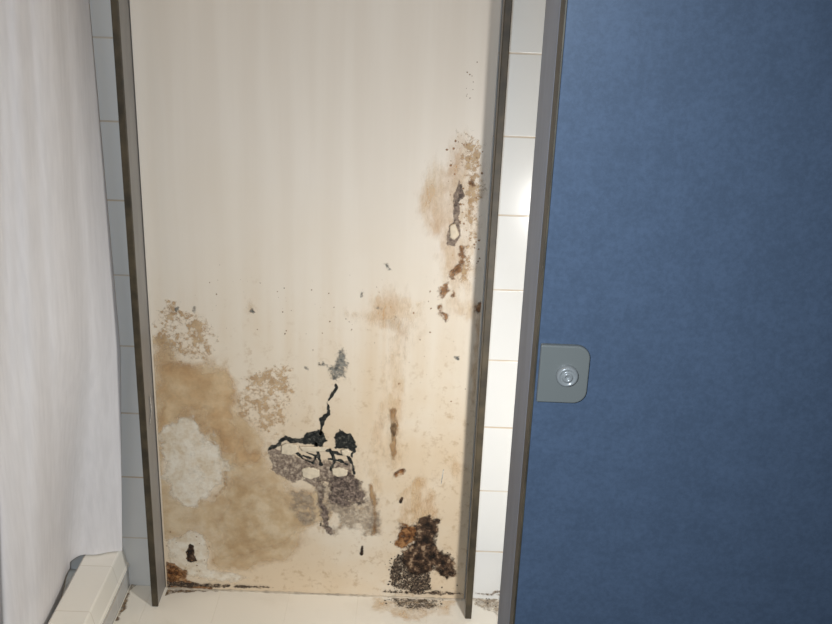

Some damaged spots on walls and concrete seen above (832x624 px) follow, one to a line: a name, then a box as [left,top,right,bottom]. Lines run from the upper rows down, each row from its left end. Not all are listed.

water stain [462,142,486,280]
water stain [153,300,380,569]
peeling [268,429,357,482]
crack [319,350,348,434]